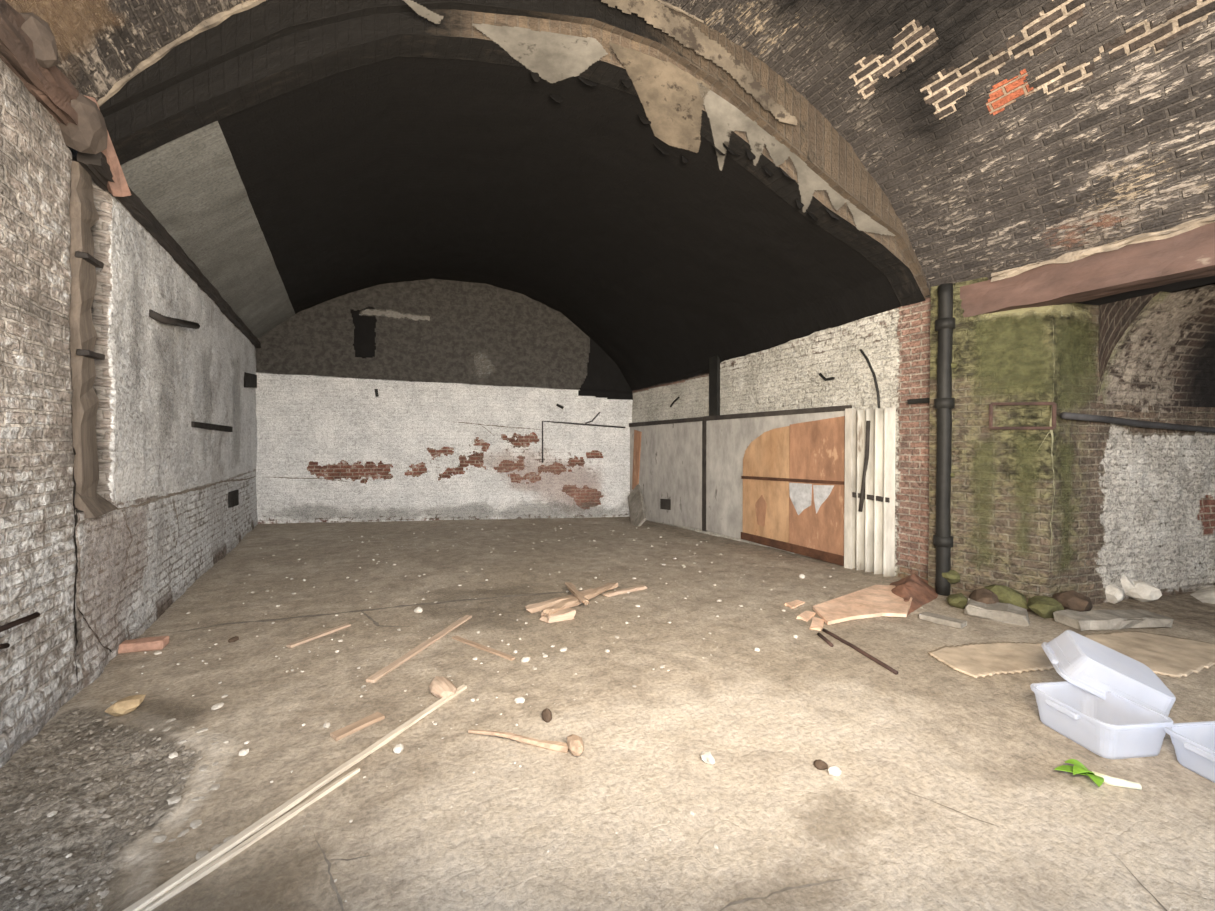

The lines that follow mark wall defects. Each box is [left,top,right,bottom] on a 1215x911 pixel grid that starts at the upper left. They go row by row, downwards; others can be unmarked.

flaking render [404,0,443,24]
spalling [848,20,939,99]
spalling [920,0,1215,120]
flaking render [472,0,896,236]
leakage [980,304,1090,318]
flaking render [307,432,604,510]
spalling [1197,495,1215,536]
crack [313,832,370,911]
crack [719,877,852,911]
crack [1120,860,1168,911]